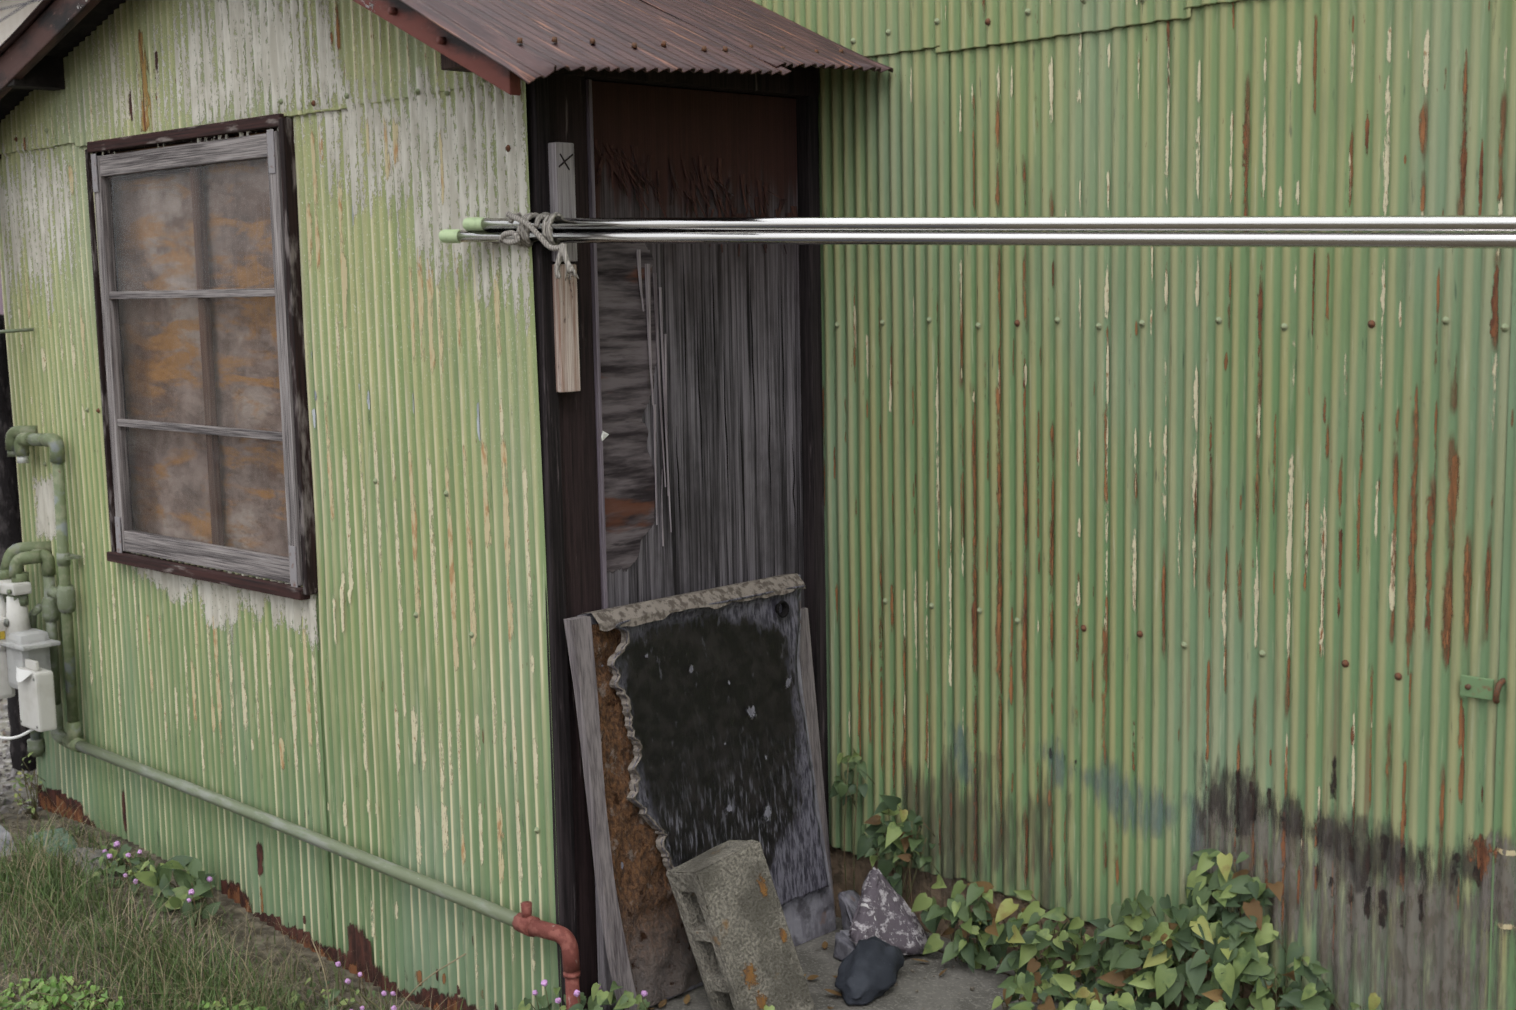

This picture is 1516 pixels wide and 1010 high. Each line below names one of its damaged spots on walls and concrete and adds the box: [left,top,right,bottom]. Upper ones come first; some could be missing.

rust [129,29,158,132]
peeling [0,0,532,372]
rust [1230,81,1250,232]
rust [1442,50,1506,215]
rust [1489,259,1500,347]
rust [1303,384,1491,712]
peeling [88,585,121,720]
peeling [120,424,538,864]
rust [37,785,96,828]
rust [221,842,498,1010]
peeling [515,801,542,887]
leakage [1191,770,1516,1010]